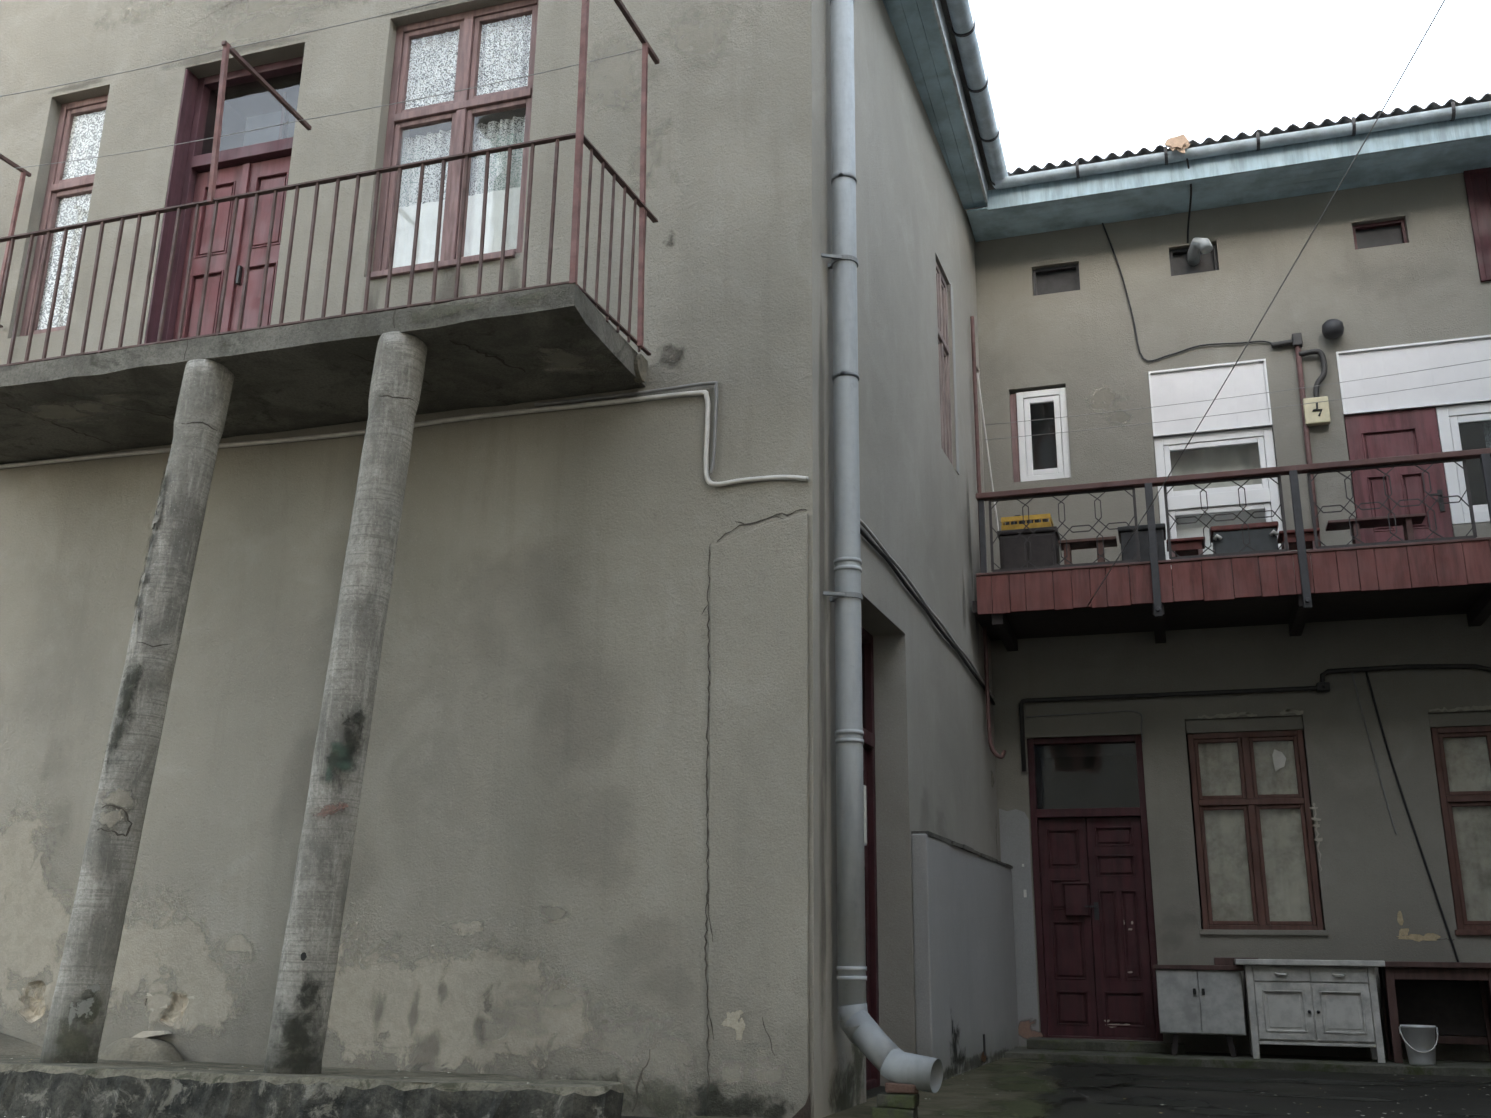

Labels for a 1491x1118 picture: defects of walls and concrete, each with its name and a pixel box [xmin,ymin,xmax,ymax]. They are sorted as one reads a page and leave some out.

water stain [107,665,142,766]
water stain [327,709,365,786]
peeling [97,788,136,837]
crack [702,509,807,1110]
flaking render [17,980,46,1023]
flaking render [107,892,253,1036]
flaking render [327,920,601,1073]
flaking render [1396,911,1441,942]